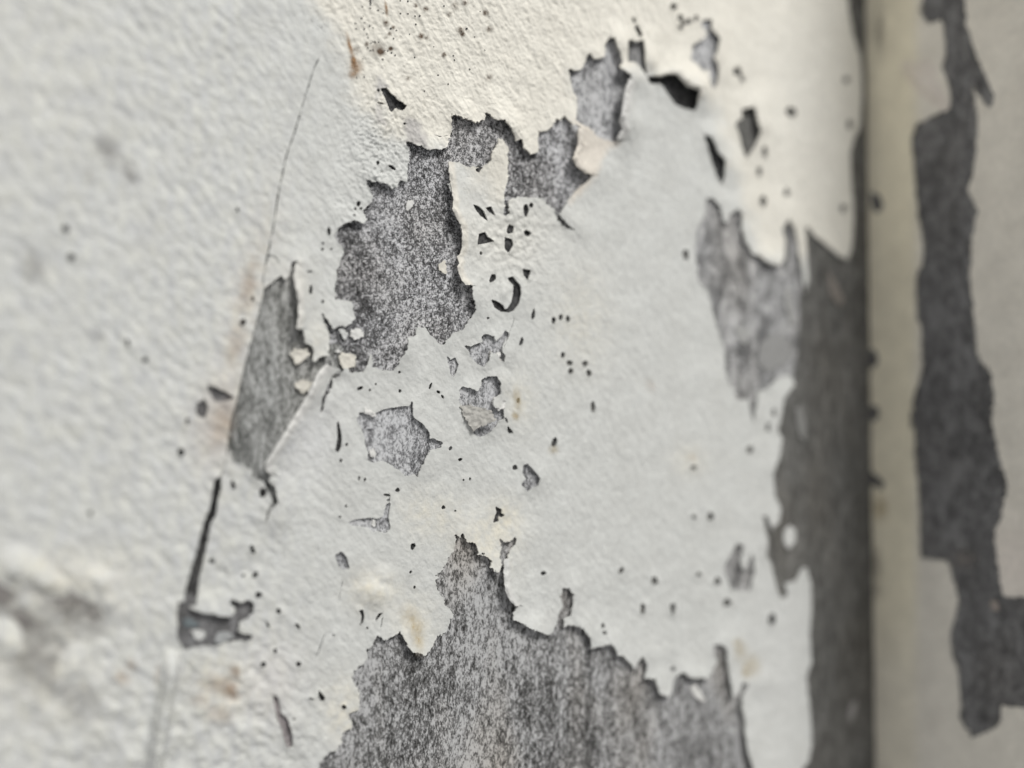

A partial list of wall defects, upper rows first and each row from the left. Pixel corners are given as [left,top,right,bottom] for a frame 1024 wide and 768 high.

peeling [176,592,262,650]
peeling [227,38,642,521]
peeling [319,533,753,768]
peeling [683,0,885,768]
peeling [908,0,1024,738]